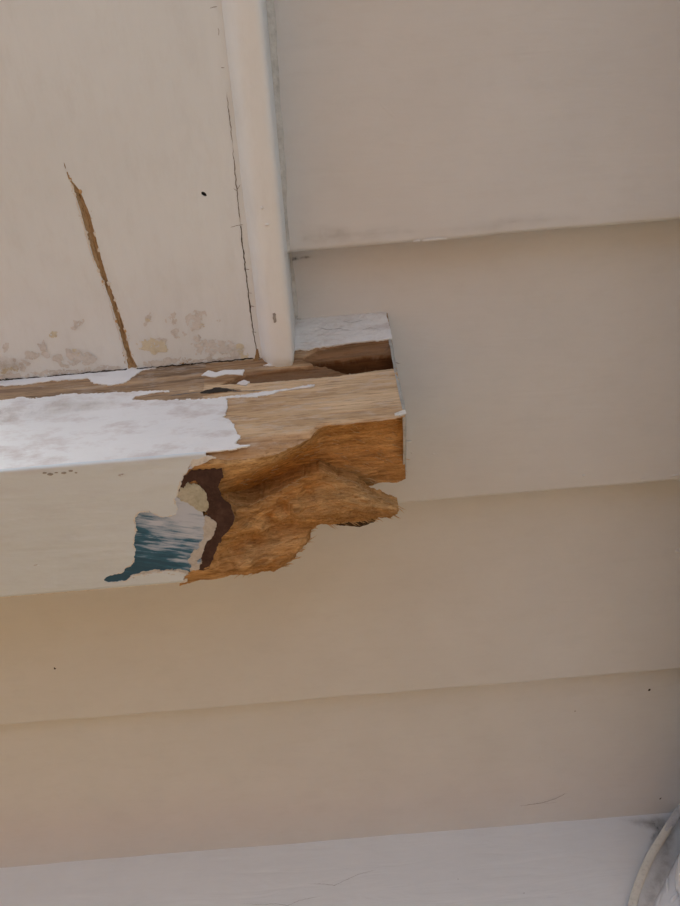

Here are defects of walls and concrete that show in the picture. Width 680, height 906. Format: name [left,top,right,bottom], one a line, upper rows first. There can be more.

crack [64,164,138,369]
crack [227,99,260,361]
peeling [0,331,120,380]
peeling [136,310,253,368]
peeling [104,455,235,583]